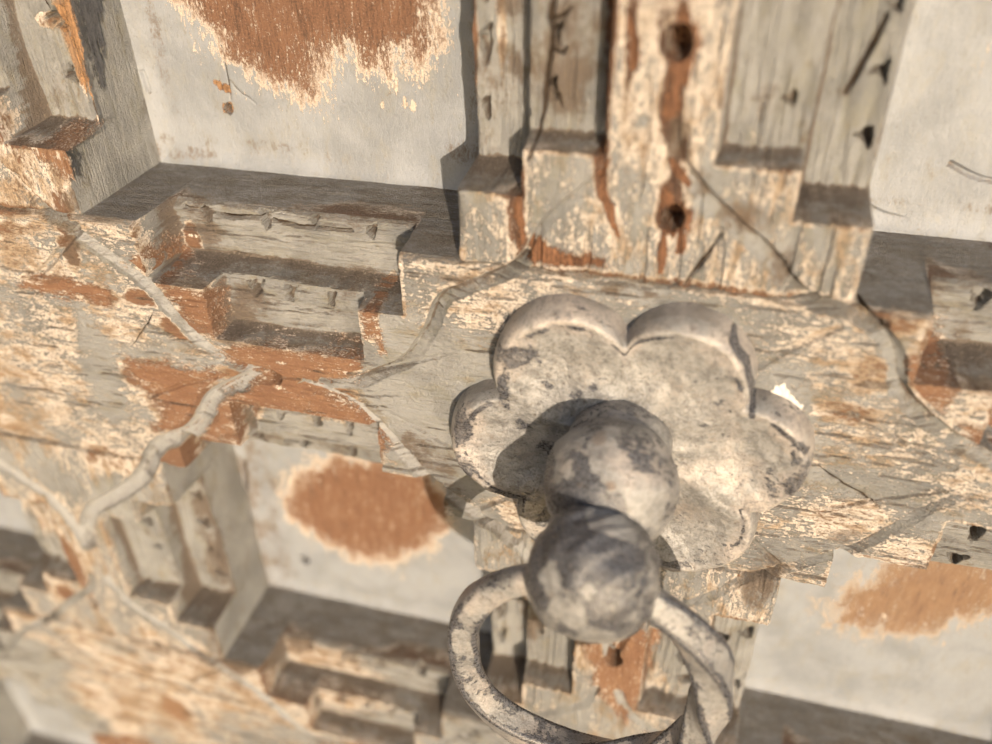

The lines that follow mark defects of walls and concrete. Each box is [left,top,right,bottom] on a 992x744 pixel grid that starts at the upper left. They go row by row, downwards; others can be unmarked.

peeling [167,0,461,128]
peeling [15,270,115,309]
crack [685,234,721,283]
peeling [112,224,472,581]
peeling [799,560,992,649]